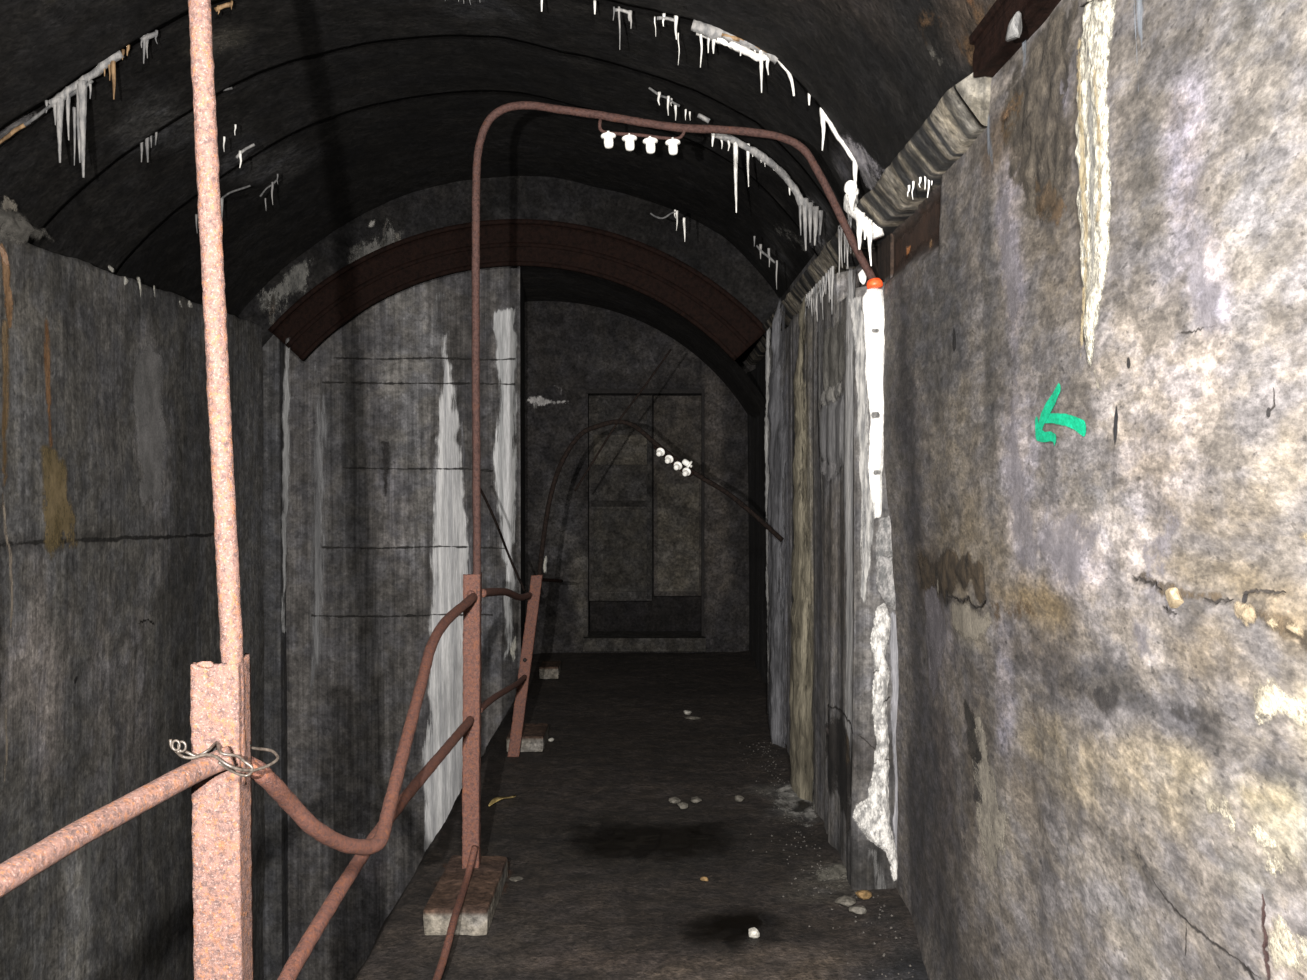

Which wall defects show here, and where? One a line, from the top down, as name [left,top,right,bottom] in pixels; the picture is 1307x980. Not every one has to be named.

leakage [691,20,795,96]
leakage [140,132,158,163]
leakage [711,133,825,251]
leakage [819,107,885,190]
leakage [1060,0,1116,390]
leakage [422,337,472,851]
leakage [764,296,875,835]
spalling [875,516,896,610]
flaking render [918,549,991,701]
crack [1153,880,1271,980]